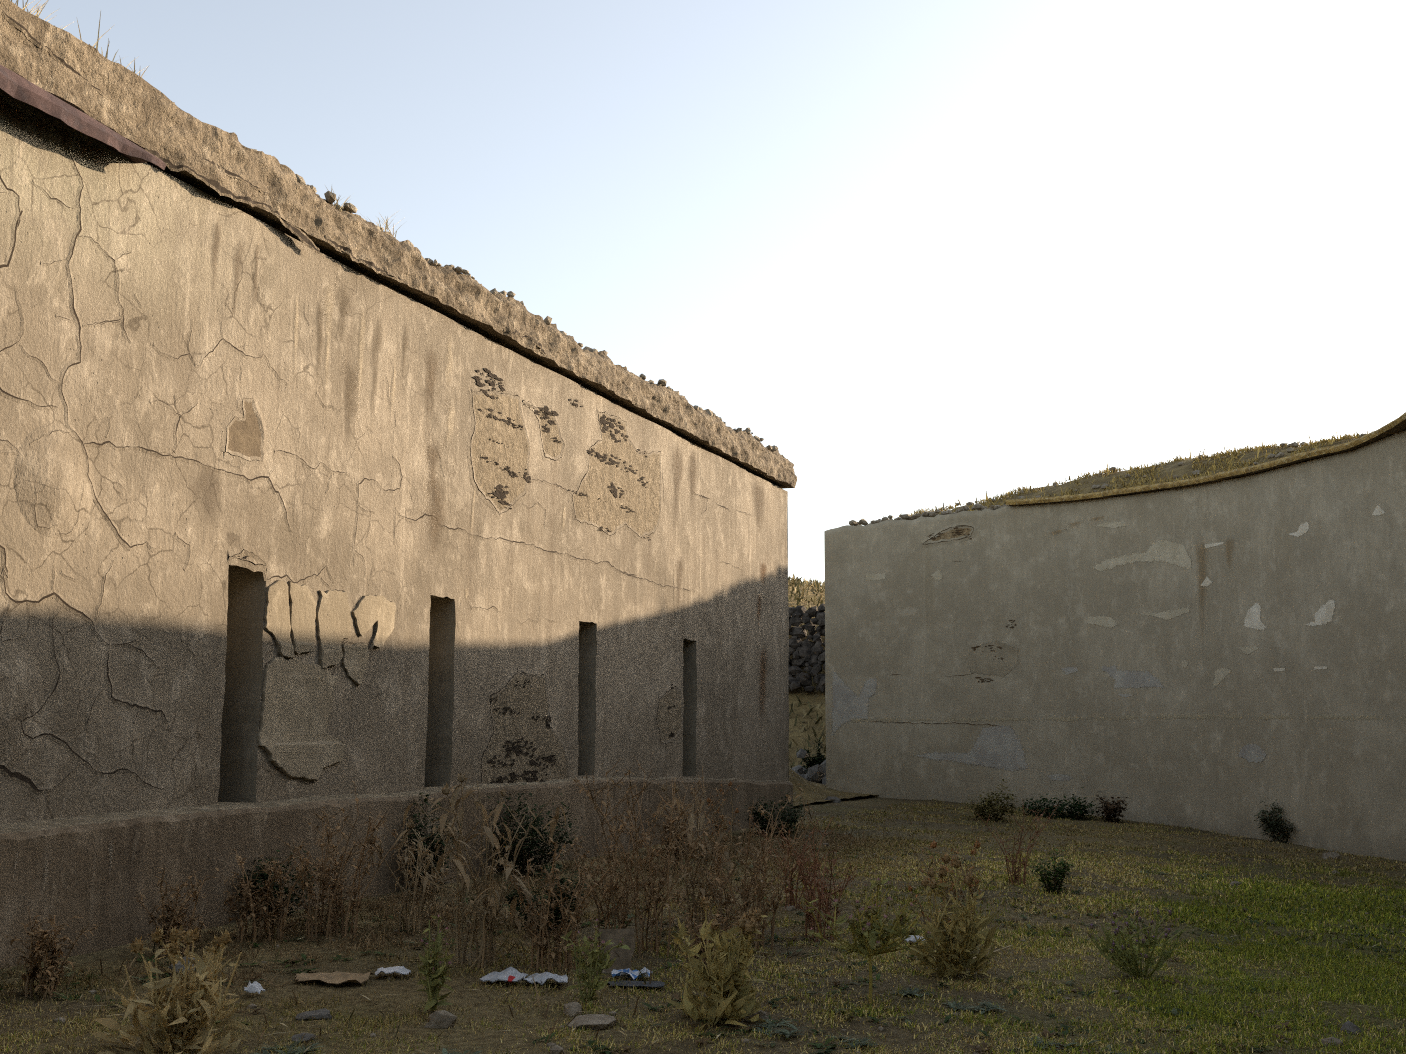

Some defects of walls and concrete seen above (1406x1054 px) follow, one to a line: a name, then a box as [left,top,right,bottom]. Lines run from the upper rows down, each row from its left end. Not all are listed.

crack [2,11,110,101]
crack [0,121,695,795]
spalling [467,368,663,542]
crack [662,466,751,516]
peeling [1093,540,1192,571]
peeling [1290,522,1309,537]
peeling [227,543,396,785]
peeling [1239,603,1266,654]
peeling [1304,599,1335,626]
spalling [478,667,571,784]